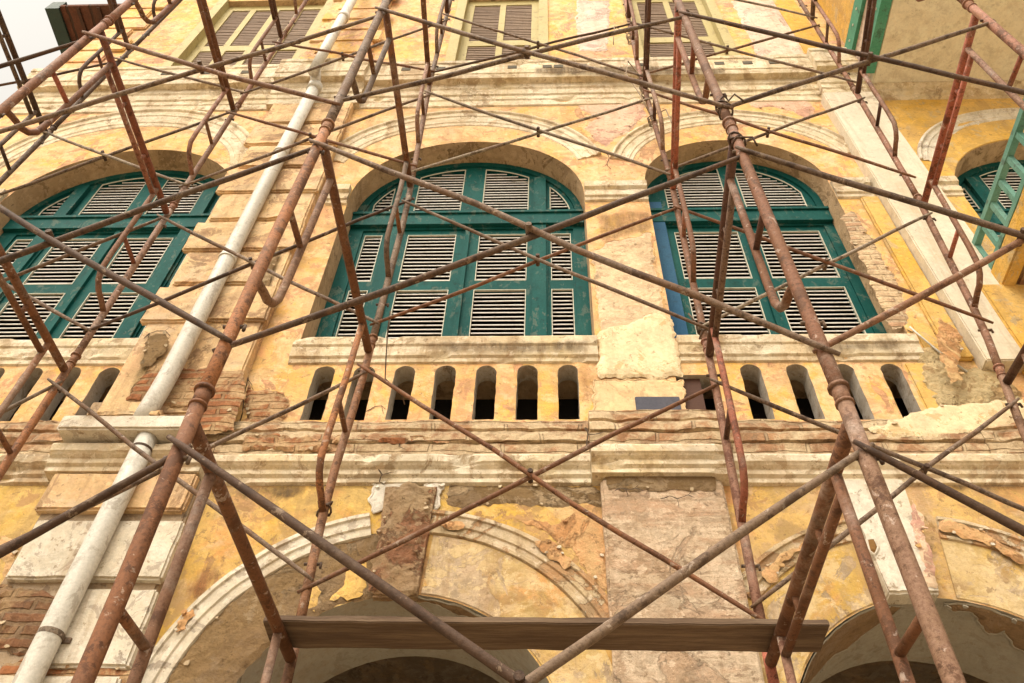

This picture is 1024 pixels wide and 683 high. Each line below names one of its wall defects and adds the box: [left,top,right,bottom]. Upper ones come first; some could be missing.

flaking render [840,211,909,329]
flaking render [126,331,169,402]
flaking render [163,368,206,411]
flaking render [200,370,290,449]
spalling [936,317,964,383]
flaking render [423,476,716,591]
peeling [910,497,1024,588]
flaking render [0,535,55,676]
peeling [944,602,1024,653]
flaking render [46,665,76,676]
flaking render [97,666,131,683]